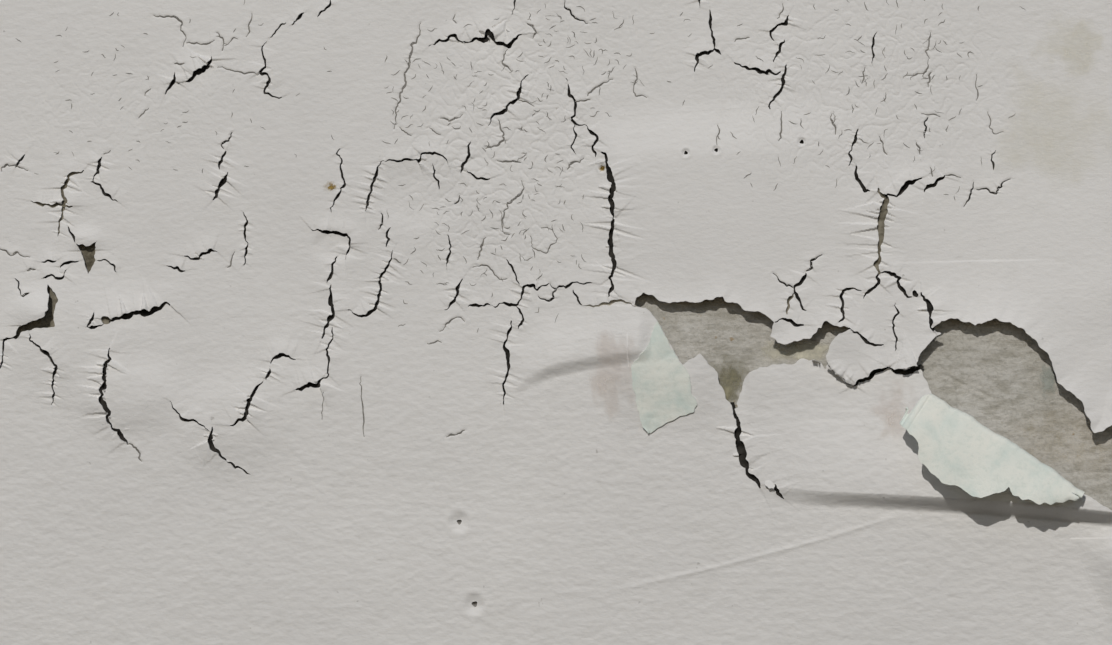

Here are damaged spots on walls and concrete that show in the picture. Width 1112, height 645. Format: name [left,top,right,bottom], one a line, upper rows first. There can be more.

crack [139,0,331,118]
crack [694,0,789,141]
crack [0,150,118,297]
crack [168,0,647,474]
crack [773,255,821,327]
crack [827,32,1009,386]
crack [0,335,57,403]
crack [87,302,170,461]
crack [730,402,784,499]
peeling [631,287,1112,510]